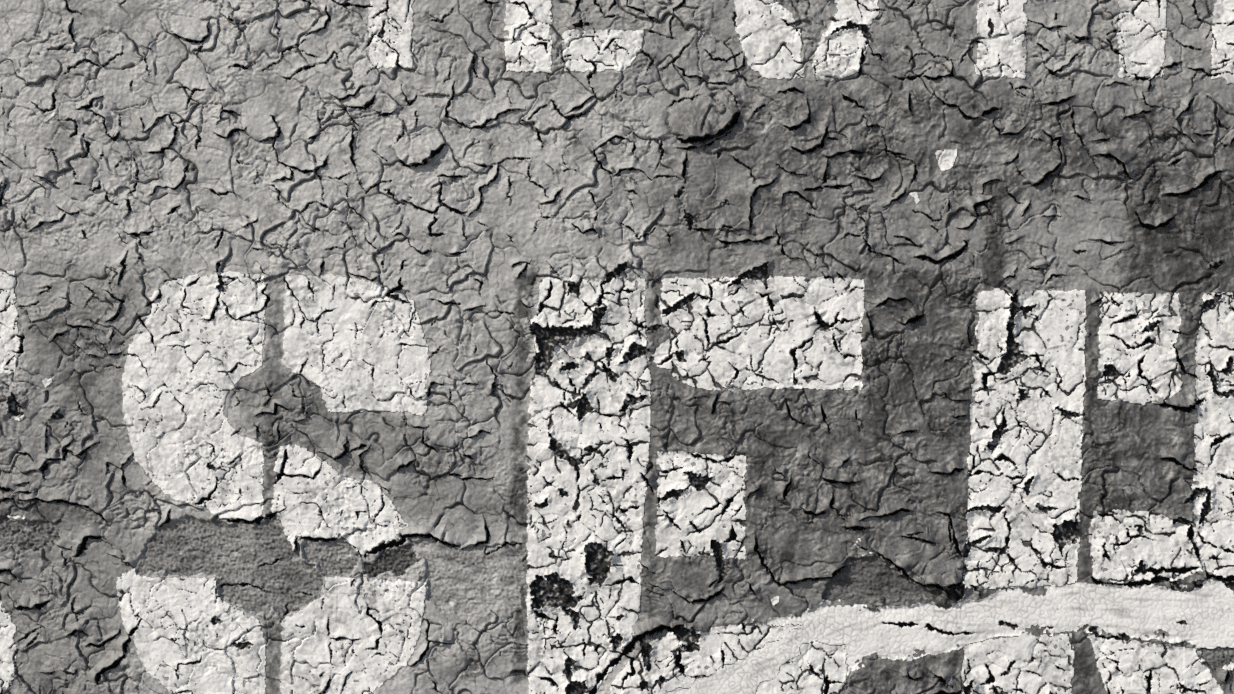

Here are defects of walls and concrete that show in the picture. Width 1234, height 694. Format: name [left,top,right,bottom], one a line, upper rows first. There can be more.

crack [0,0,1135,601]
peeling [520,279,700,421]
peeling [997,289,1040,401]
crack [1091,294,1204,413]
peeling [544,426,602,486]
peeling [657,464,717,504]
peeling [1019,469,1087,557]
crack [0,561,142,694]
crack [280,578,453,694]
crack [535,561,725,694]
peeling [606,610,705,694]
crack [883,622,1065,694]